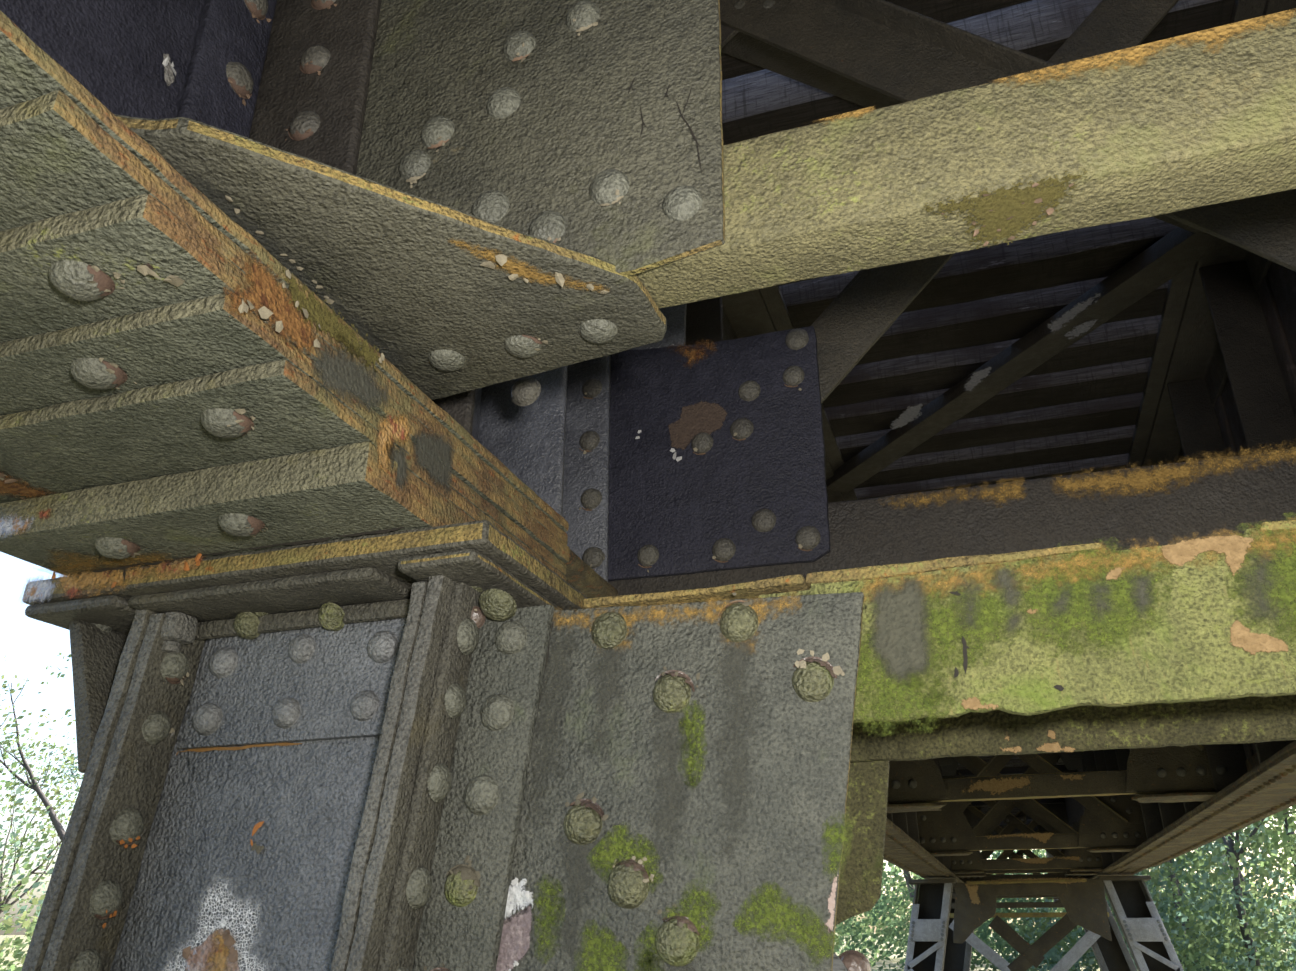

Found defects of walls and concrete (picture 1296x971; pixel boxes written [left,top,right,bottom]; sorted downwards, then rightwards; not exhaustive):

corrosion [377,414,410,471]
corrosion [1054,447,1296,495]
corrosion [894,479,1023,507]
corrosion [49,552,202,598]
peeling [1161,534,1254,576]
peeling [1229,620,1288,655]
peeling [182,929,240,971]